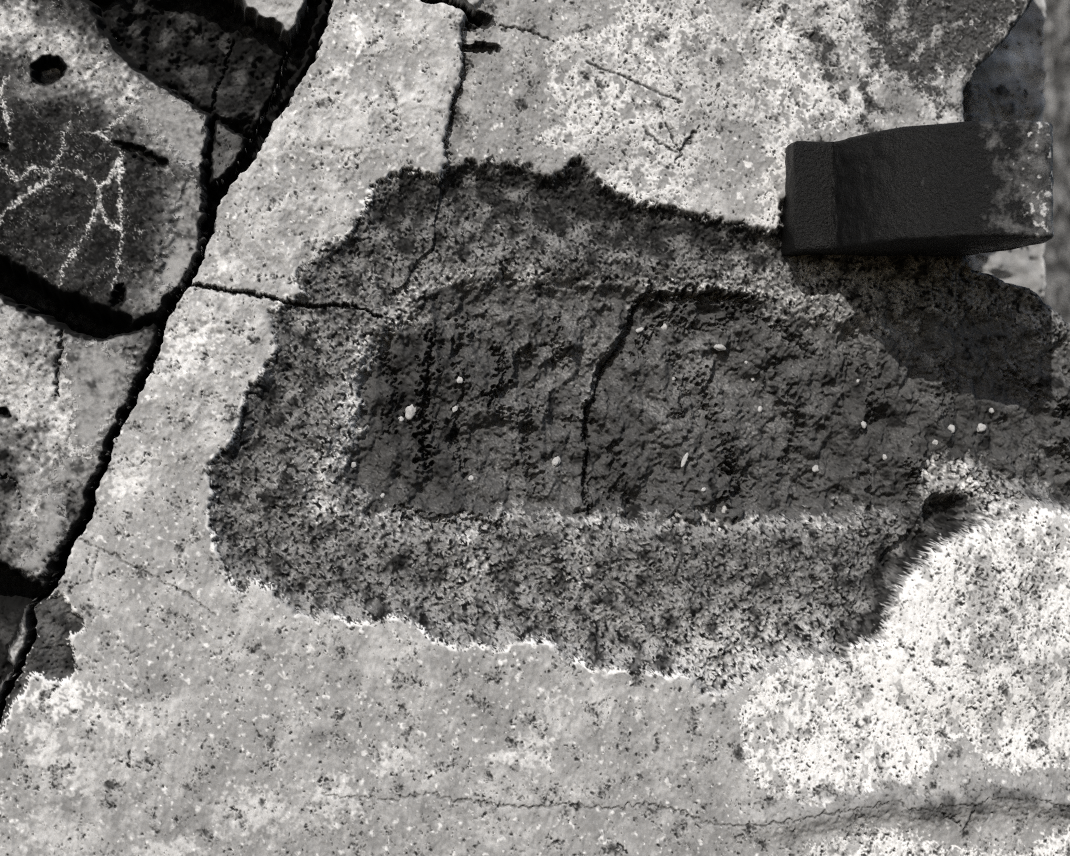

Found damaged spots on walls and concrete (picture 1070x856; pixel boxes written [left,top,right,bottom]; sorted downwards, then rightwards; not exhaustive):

crack [421,0,555,43]
crack [0,0,382,723]
crack [321,792,1070,831]